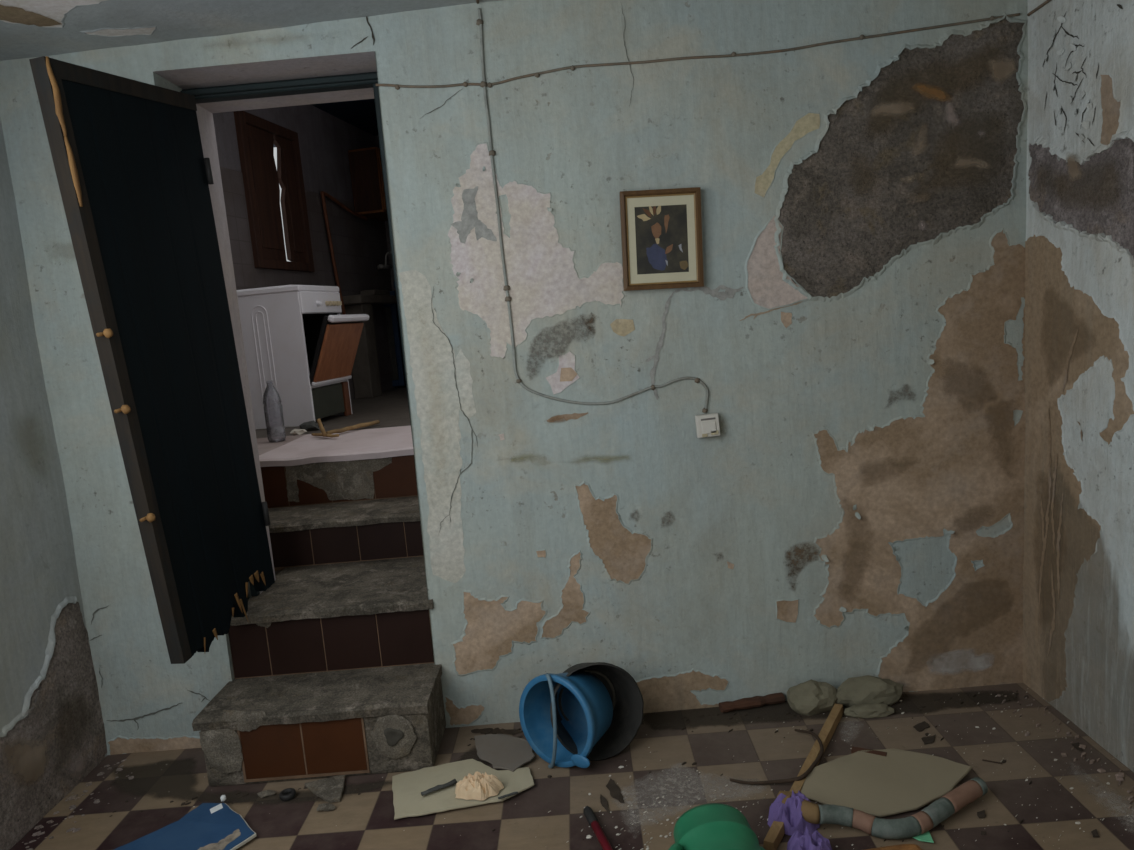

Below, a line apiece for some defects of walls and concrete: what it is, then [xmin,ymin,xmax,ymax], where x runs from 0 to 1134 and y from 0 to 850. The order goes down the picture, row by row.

peeling [0,0,110,28]
peeling [80,26,157,37]
peeling [447,142,635,359]
crack [431,286,478,532]
peeling [545,351,580,395]
peeling [744,12,1134,703]
peeling [450,481,653,677]
spalling [0,596,201,850]
peeling [636,668,754,713]